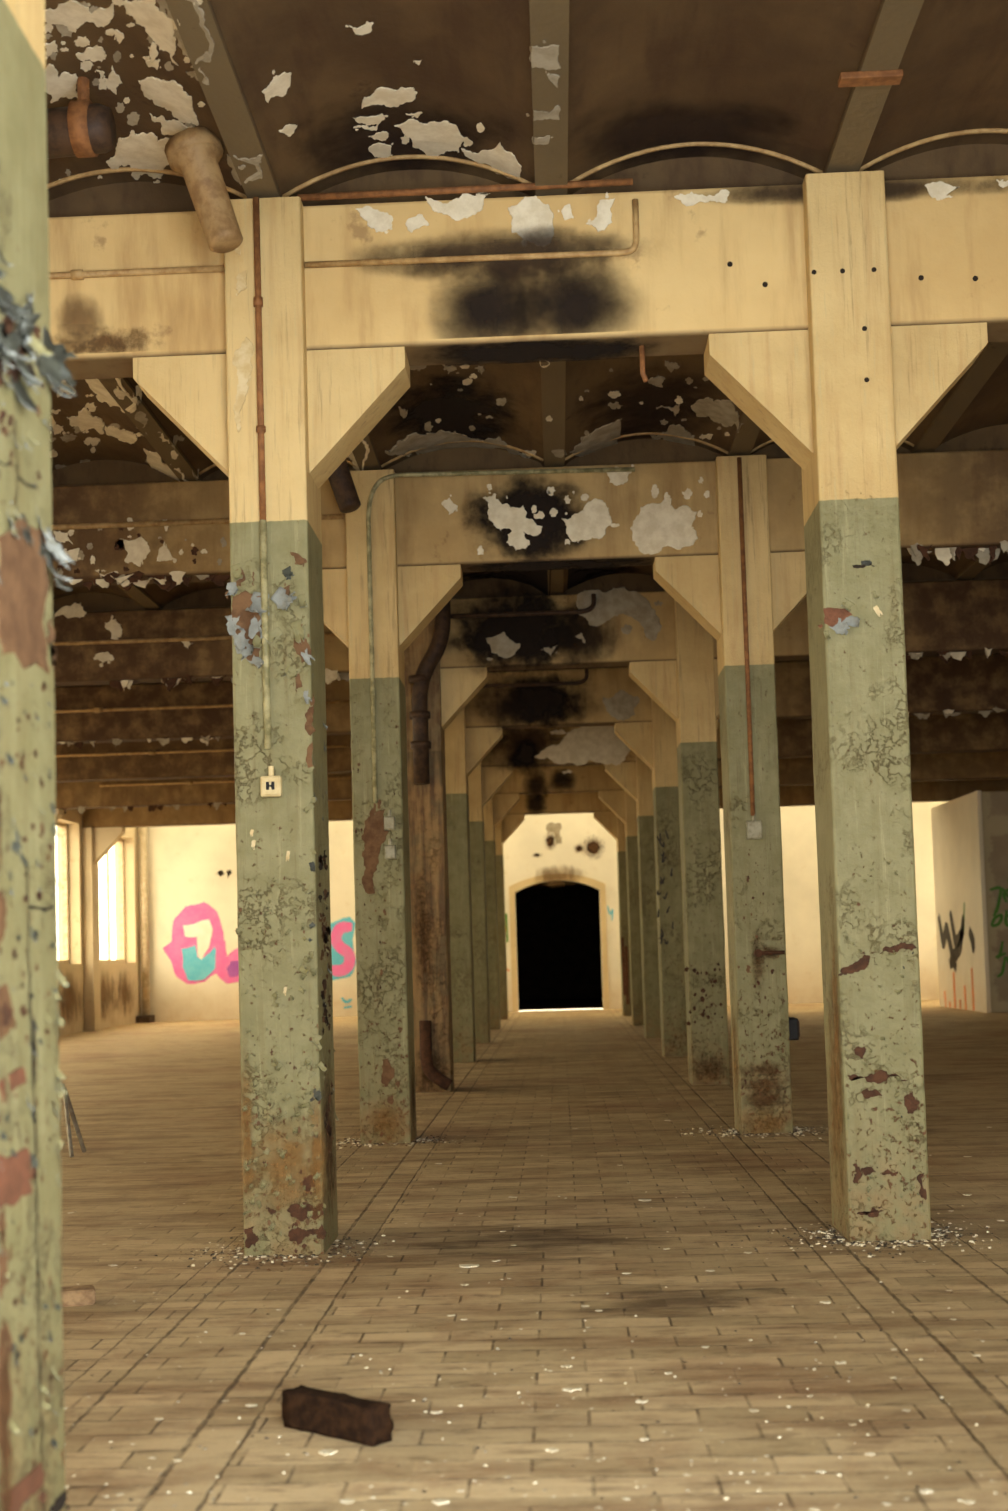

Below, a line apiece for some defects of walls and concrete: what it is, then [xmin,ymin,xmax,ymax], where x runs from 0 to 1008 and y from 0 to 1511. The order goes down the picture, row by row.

peeling [45,0,214,183]
peeling [353,87,522,179]
peeling [355,192,490,234]
peeling [508,192,615,237]
water stain [64,302,142,354]
peeling [348,391,622,471]
peeling [0,246,349,821]
peeling [483,477,710,555]
spalling [907,540,1008,566]
corrosion [417,877,432,980]
peeling [235,847,339,1253]
peeling [0,749,85,1462]